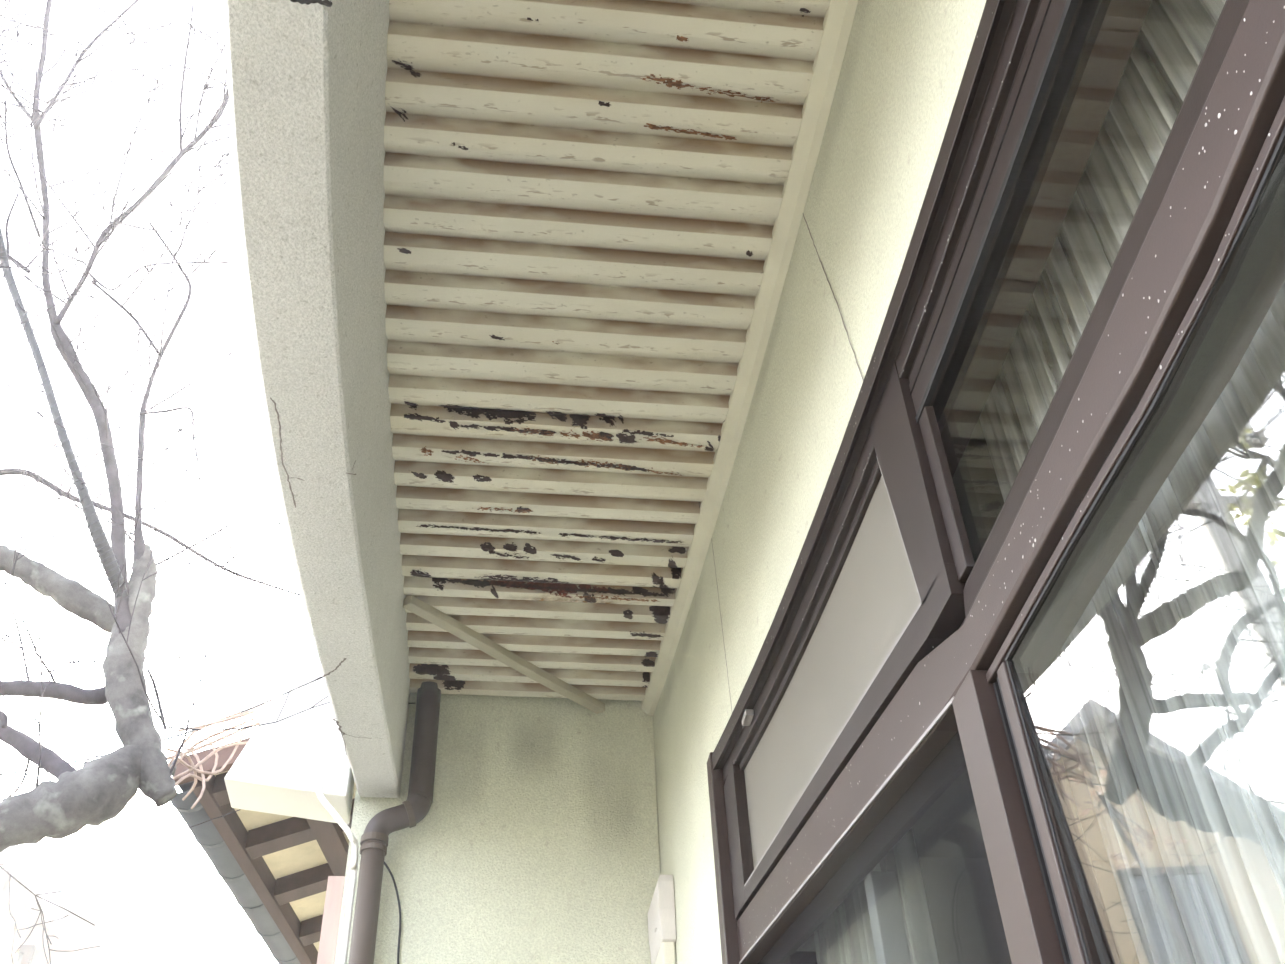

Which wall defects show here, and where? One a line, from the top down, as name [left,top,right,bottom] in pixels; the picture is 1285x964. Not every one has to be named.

crack [290,0,333,8]
rust [641,74,775,103]
rust [644,123,737,140]
rust [404,413,703,448]
rust [421,446,685,476]
rust [410,569,448,591]
rust [464,579,671,604]